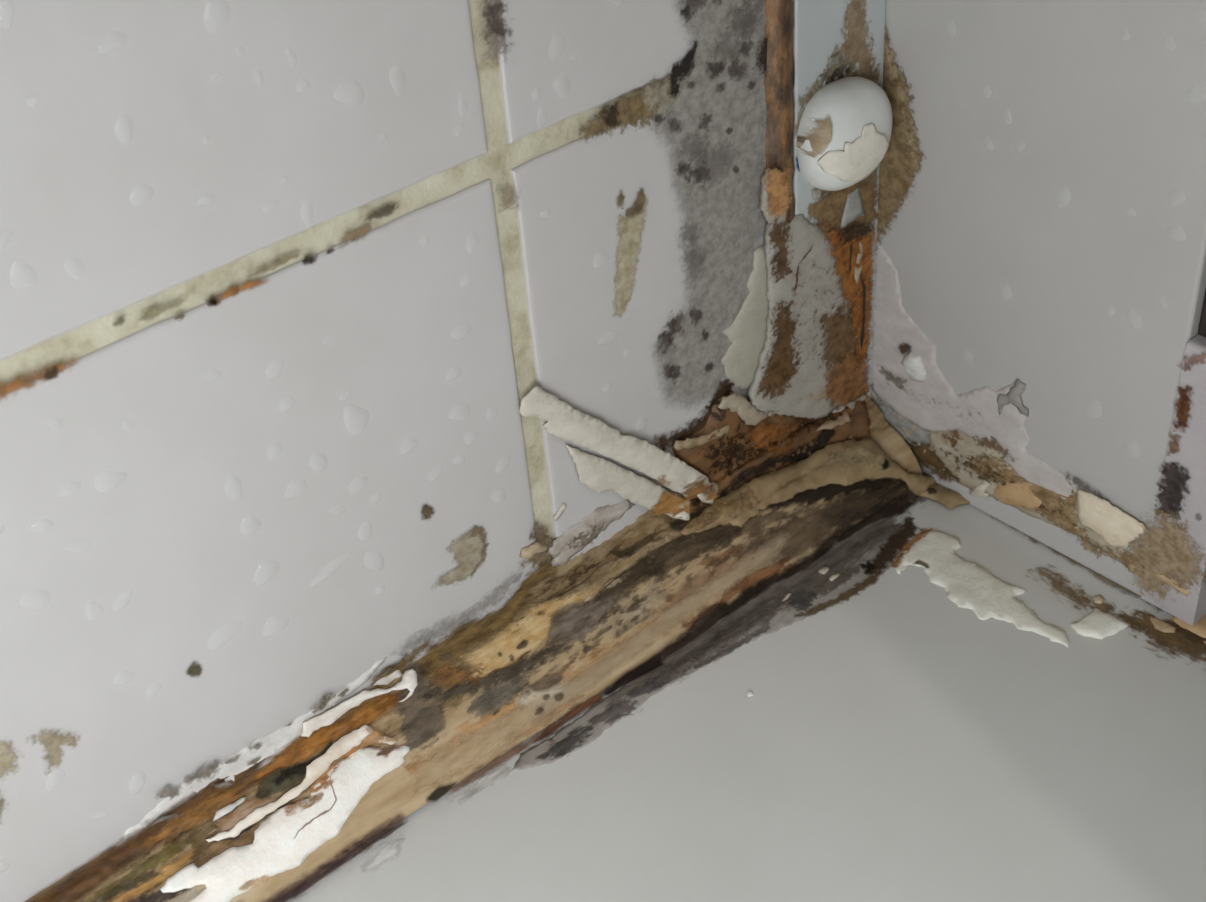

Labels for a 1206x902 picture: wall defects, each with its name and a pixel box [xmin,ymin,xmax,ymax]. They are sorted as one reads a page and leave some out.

leakage [481,0,512,63]
leakage [0,358,75,399]
leakage [140,300,185,321]
leakage [206,204,399,306]
leakage [578,0,767,451]
flaking render [519,168,1146,568]
peeling [892,528,1129,647]
peeling [117,640,429,845]
peeling [160,725,410,902]